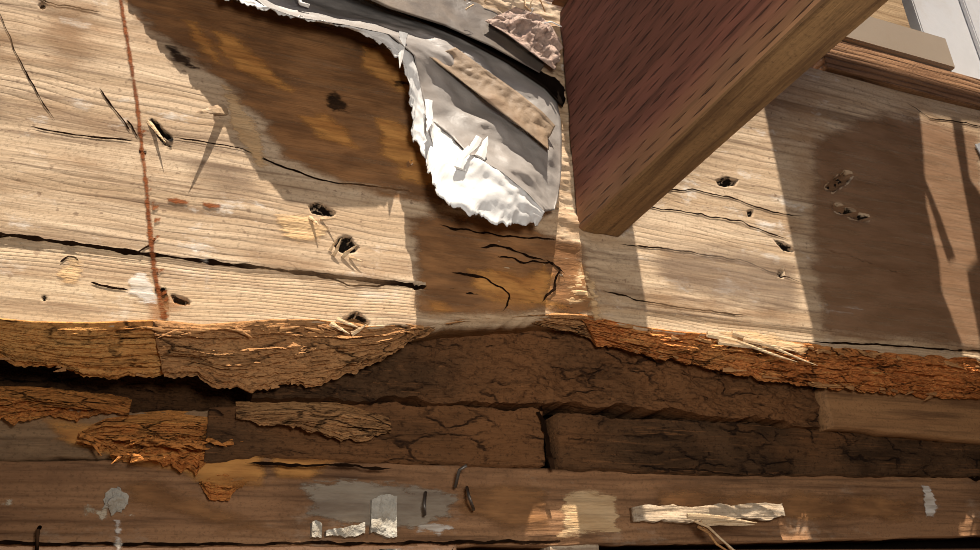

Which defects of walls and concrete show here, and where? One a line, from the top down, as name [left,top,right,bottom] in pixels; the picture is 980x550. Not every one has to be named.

rust [119,0,180,319]
peeling [57,256,83,283]
crack [0,232,426,290]
peeling [129,273,157,303]
peeling [140,326,206,338]
peeling [225,326,252,338]
peeling [279,325,352,334]
peeling [807,381,854,391]
peeling [76,433,234,464]
damp [130,456,331,485]
crack [0,539,560,550]